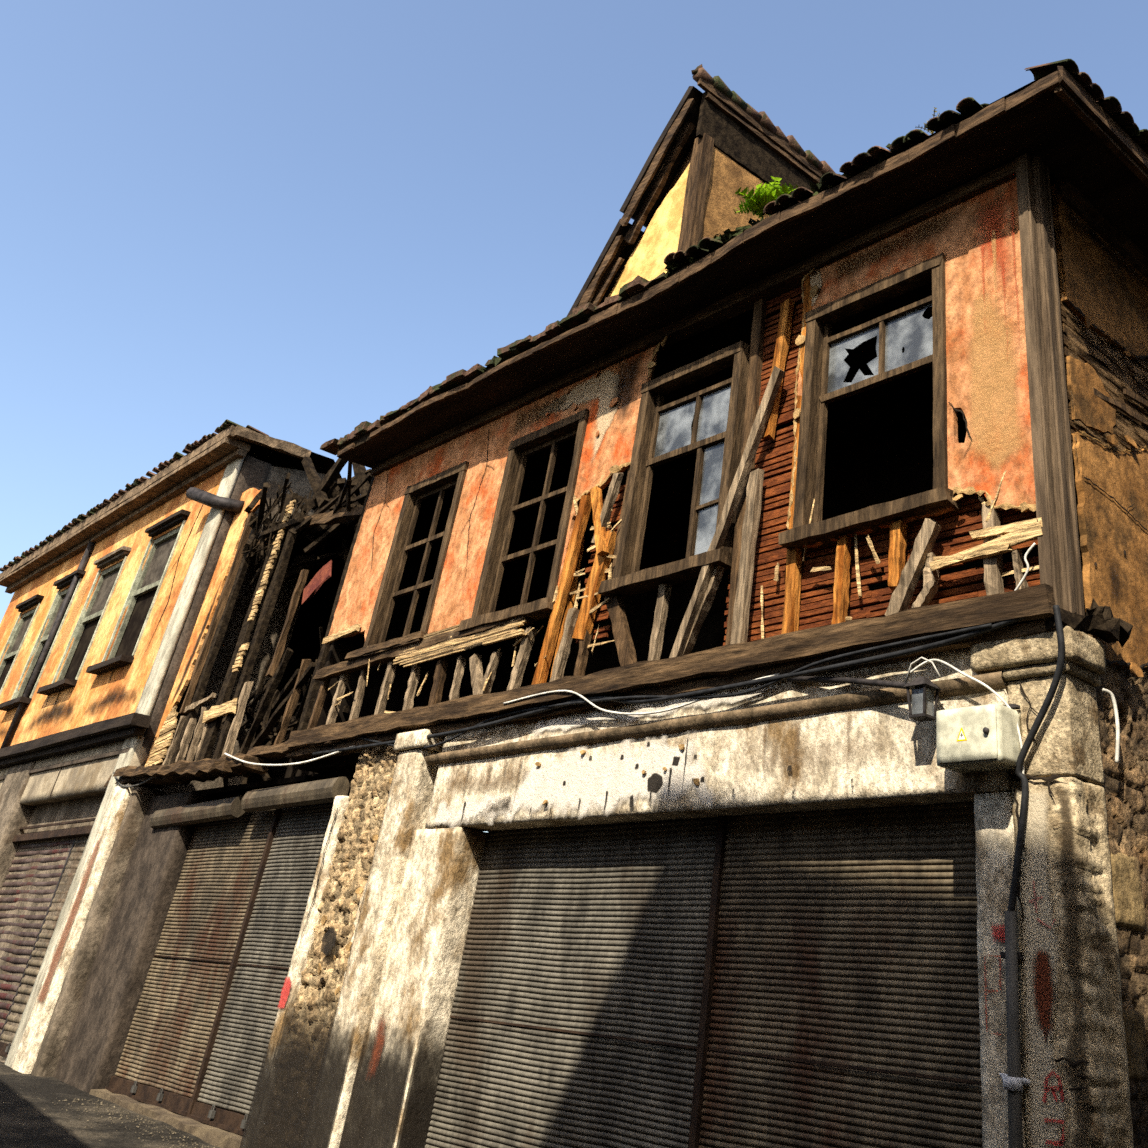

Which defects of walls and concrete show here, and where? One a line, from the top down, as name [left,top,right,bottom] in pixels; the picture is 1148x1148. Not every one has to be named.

spalling [320,272,668,455]
flaking render [576,462,631,502]
flaking render [952,486,1036,513]
flaking render [1106,658,1148,677]